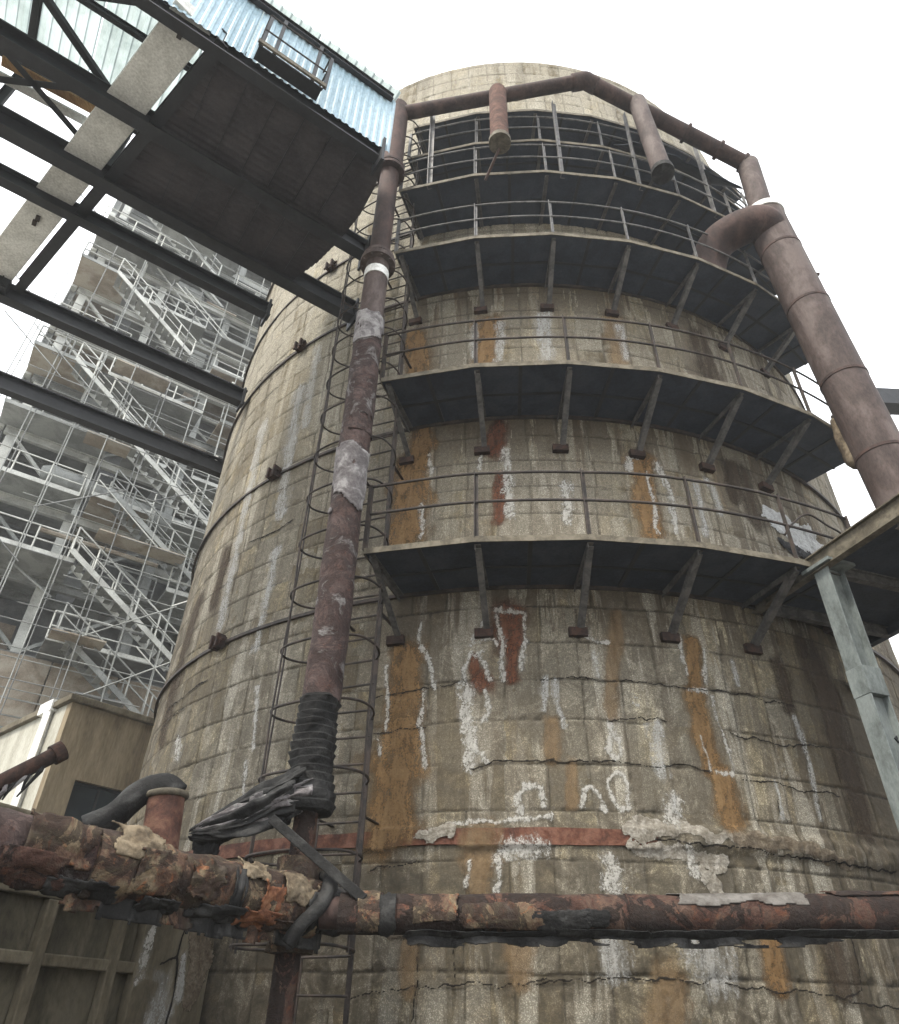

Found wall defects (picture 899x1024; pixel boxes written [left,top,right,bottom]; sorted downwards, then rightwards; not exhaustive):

spalling [761,505,824,559]
corrosion [468,601,525,693]
leakage [457,607,528,773]
corrosion [361,641,430,865]
peeling [413,821,456,843]
leakage [453,782,554,826]
crack [469,758,710,772]
leakage [580,721,631,813]
corrosion [682,635,748,833]
peeling [622,814,856,894]
crack [655,838,896,874]
crack [350,939,899,1022]